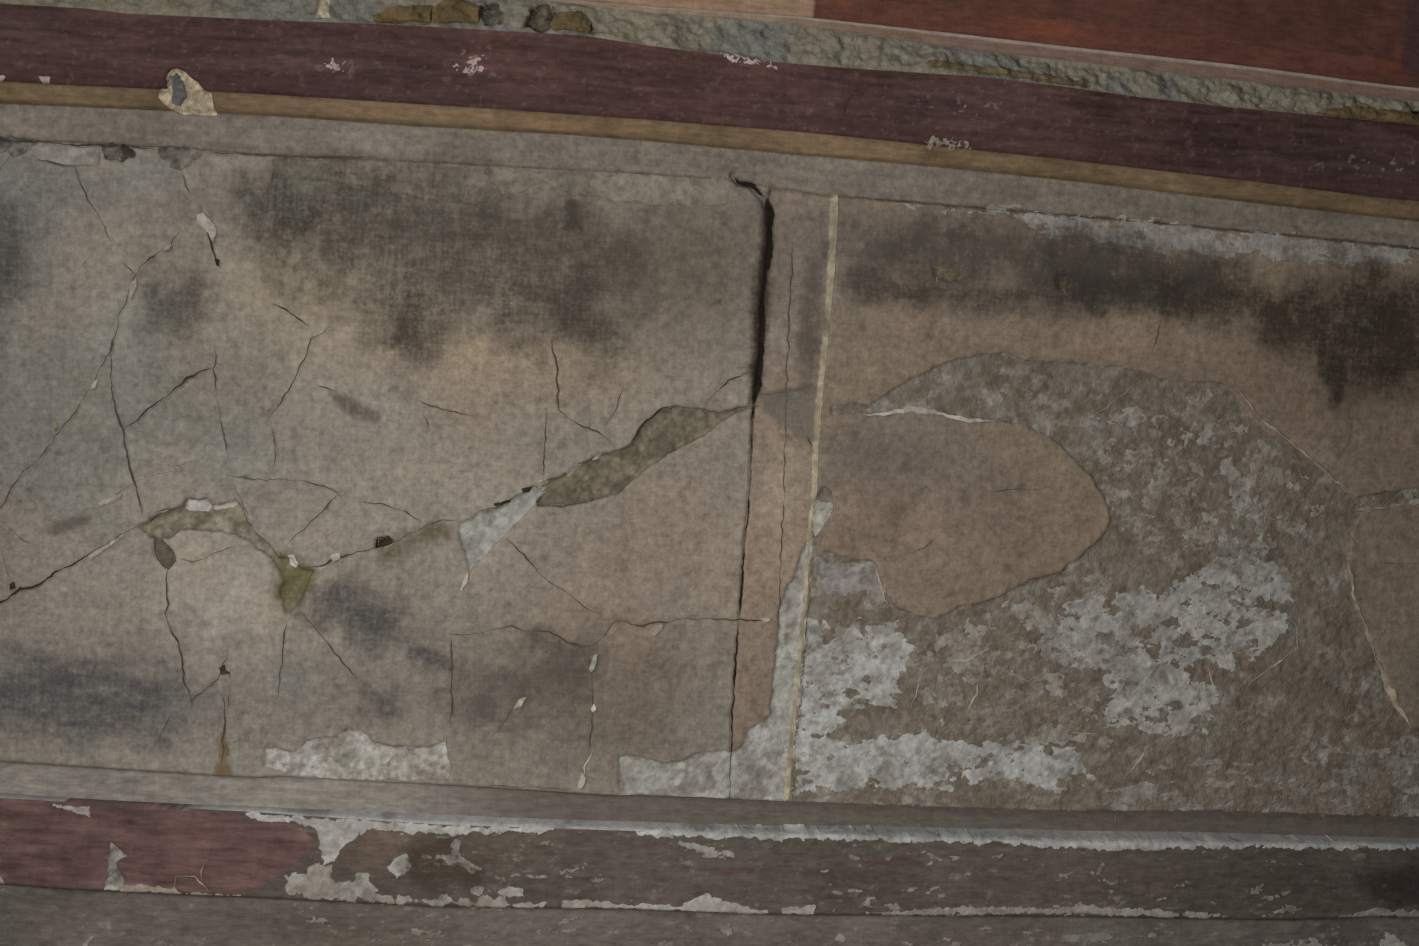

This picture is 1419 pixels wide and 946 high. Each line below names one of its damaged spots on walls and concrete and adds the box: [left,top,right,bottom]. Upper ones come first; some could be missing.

crack [0,140,454,761]
flaking render [374,536,393,550]
crack [418,400,473,429]
flaking render [458,405,749,570]
crack [448,175,815,796]
flaking render [618,194,1419,817]
water stain [0,659,167,727]
peeling [53,804,90,818]
flaking render [104,842,241,896]
flaking render [264,729,452,781]
peeling [245,811,816,946]
peeling [636,824,1419,946]